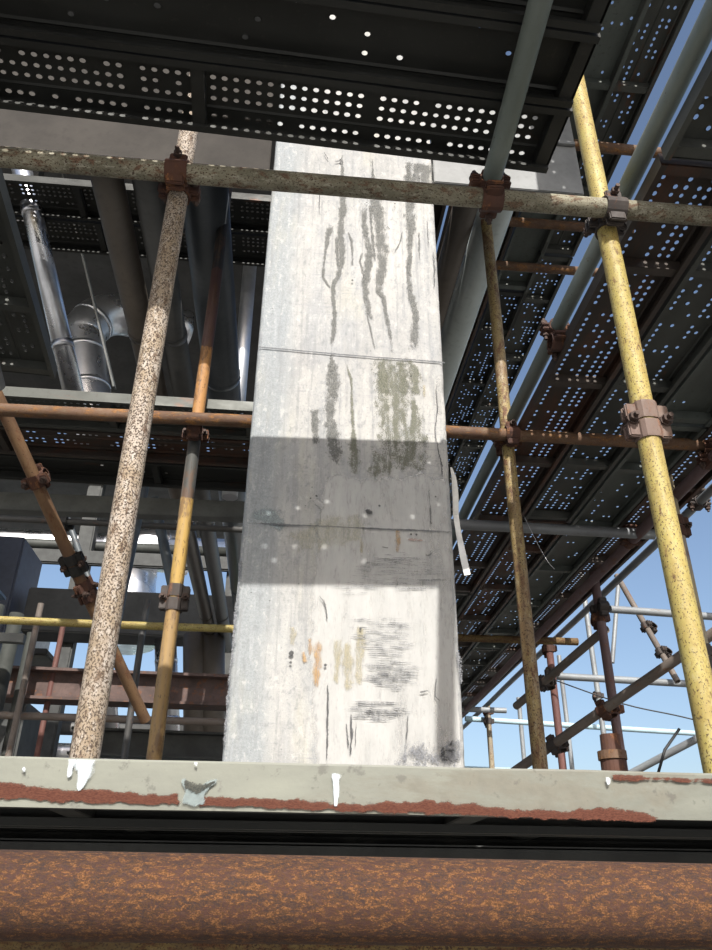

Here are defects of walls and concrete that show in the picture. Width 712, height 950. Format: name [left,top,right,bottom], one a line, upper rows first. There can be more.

damp [310,197,423,473]
rust [0,782,180,805]
rust [198,796,657,822]